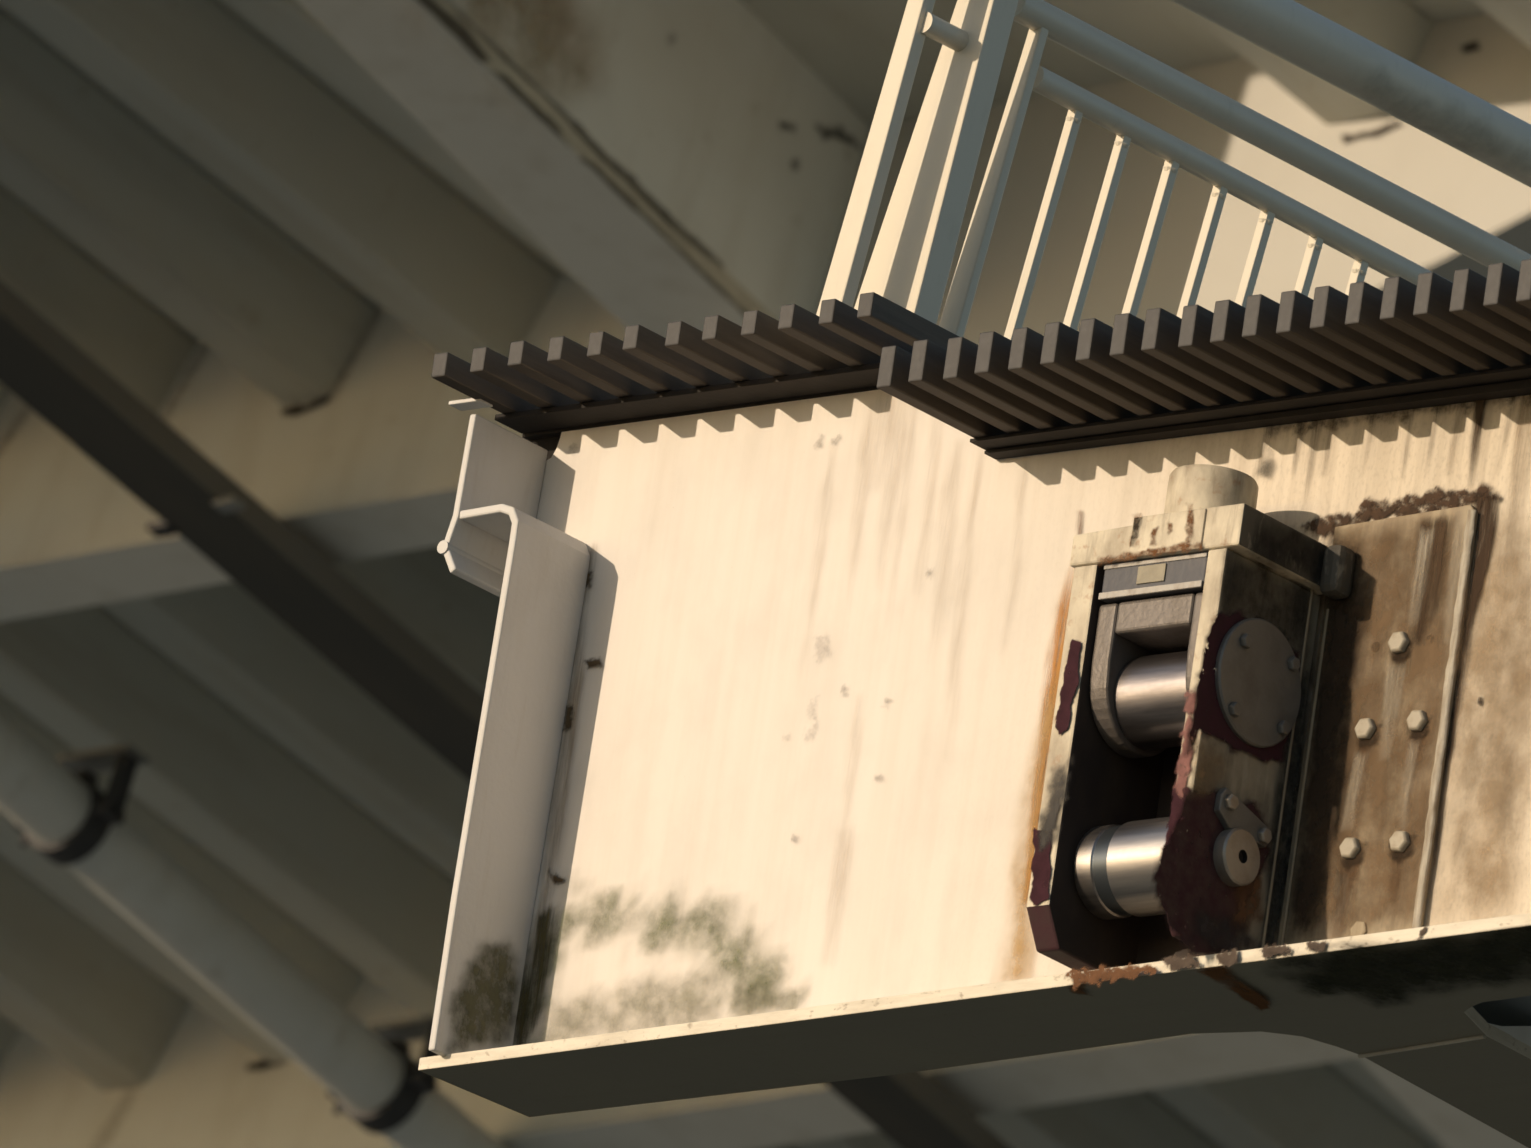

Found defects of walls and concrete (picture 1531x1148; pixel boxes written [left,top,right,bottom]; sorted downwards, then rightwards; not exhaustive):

rust [1100,508,1202,563]
rust [1292,484,1501,931]
rust [1012,581,1073,977]
water stain [515,908,552,1045]
rust [1070,983,1088,995]
rust [1198,968,1270,1010]